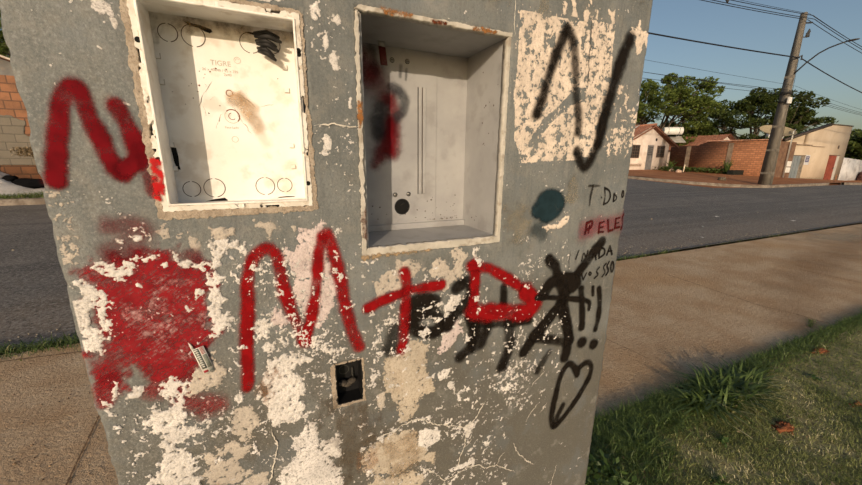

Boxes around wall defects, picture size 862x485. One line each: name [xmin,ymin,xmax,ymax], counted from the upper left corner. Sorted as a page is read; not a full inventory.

peeling [69,0,120,29]
peeling [306,0,353,72]
peeling [630,20,649,55]
peeling [510,0,639,196]
peeling [315,84,358,200]